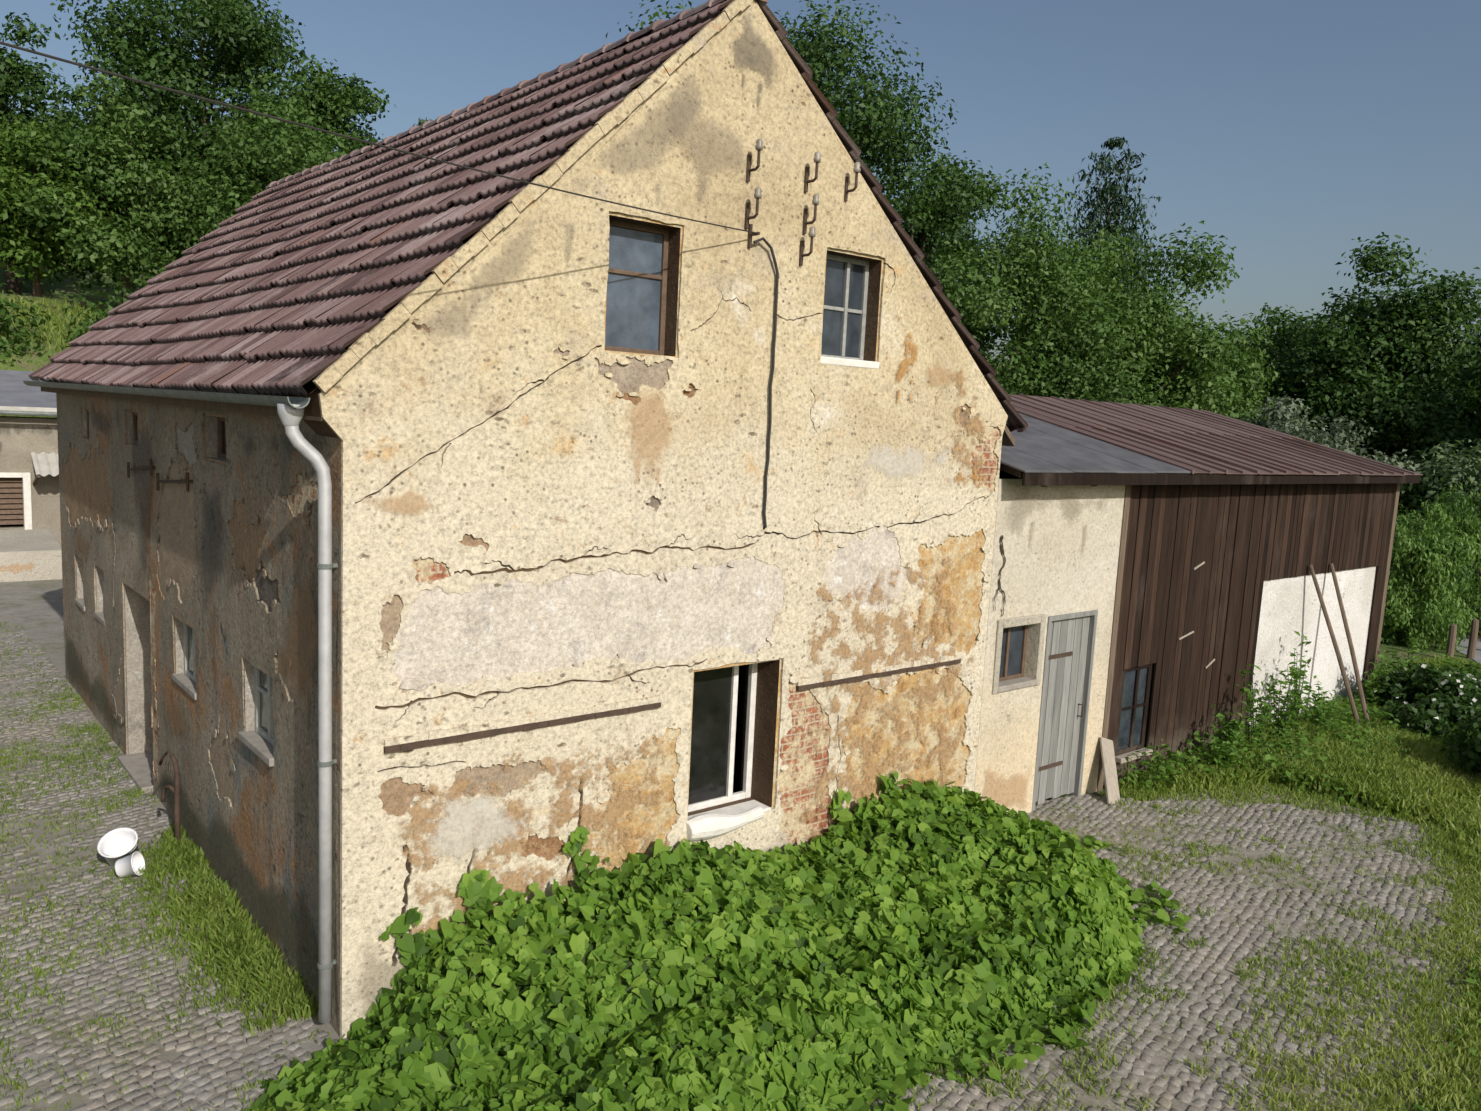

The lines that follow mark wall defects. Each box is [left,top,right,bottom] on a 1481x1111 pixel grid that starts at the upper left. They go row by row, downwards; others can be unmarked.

flaking render [594,356,672,405]
crack [355,345,601,503]
flaking render [376,595,403,654]
flaking render [412,557,450,584]
crack [454,496,988,576]
flaking render [823,525,990,655]
crack [994,535,1006,616]
crack [375,659,706,715]
flaking render [378,777,433,816]
flaking render [588,727,680,874]
flaking render [776,668,971,849]
flaking render [520,831,565,861]